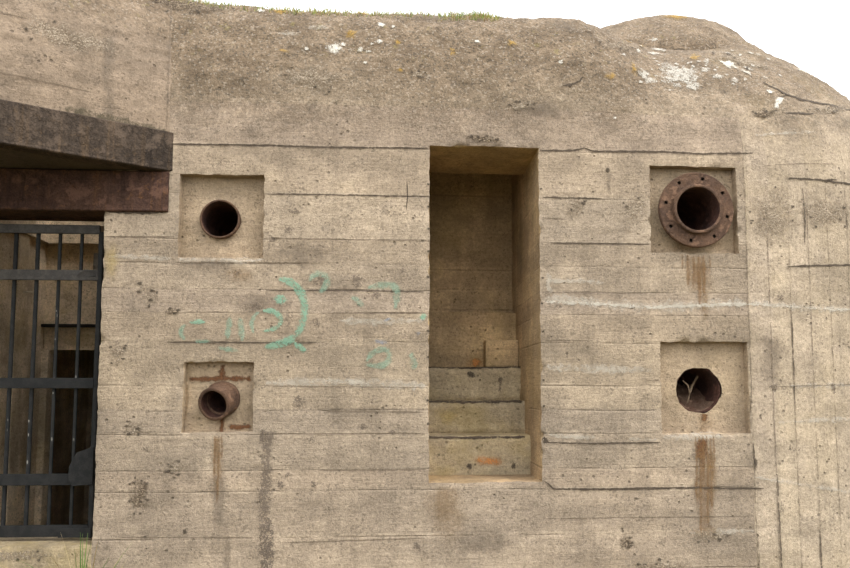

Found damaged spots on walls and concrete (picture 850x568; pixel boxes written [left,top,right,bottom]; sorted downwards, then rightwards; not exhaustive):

crack [764,82,850,115]
rust [697,440,712,468]
leakage [258,430,290,568]